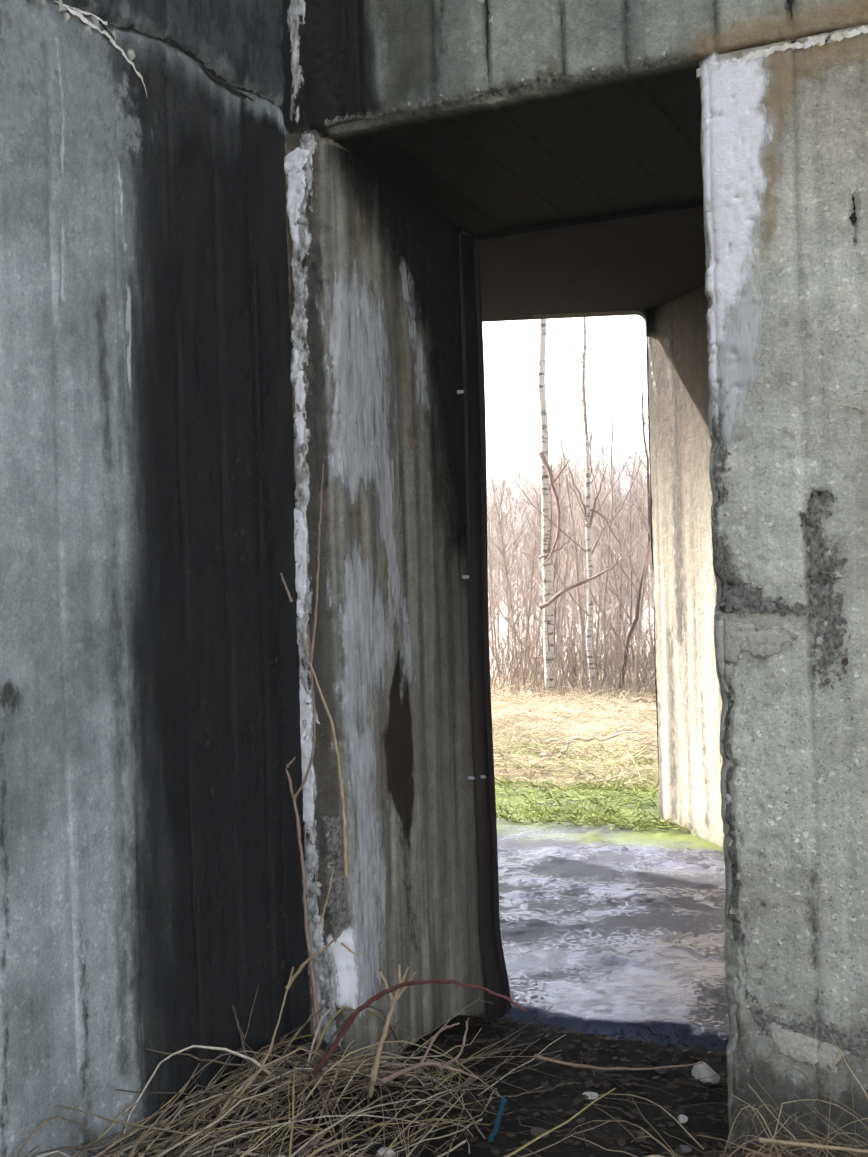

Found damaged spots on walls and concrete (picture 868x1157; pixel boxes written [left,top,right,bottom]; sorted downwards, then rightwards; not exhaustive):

crack [39,0,279,107]
damp [0,0,468,1157]
spalling [712,407,858,942]
damp [807,900,817,966]
damp [732,1065,868,1157]